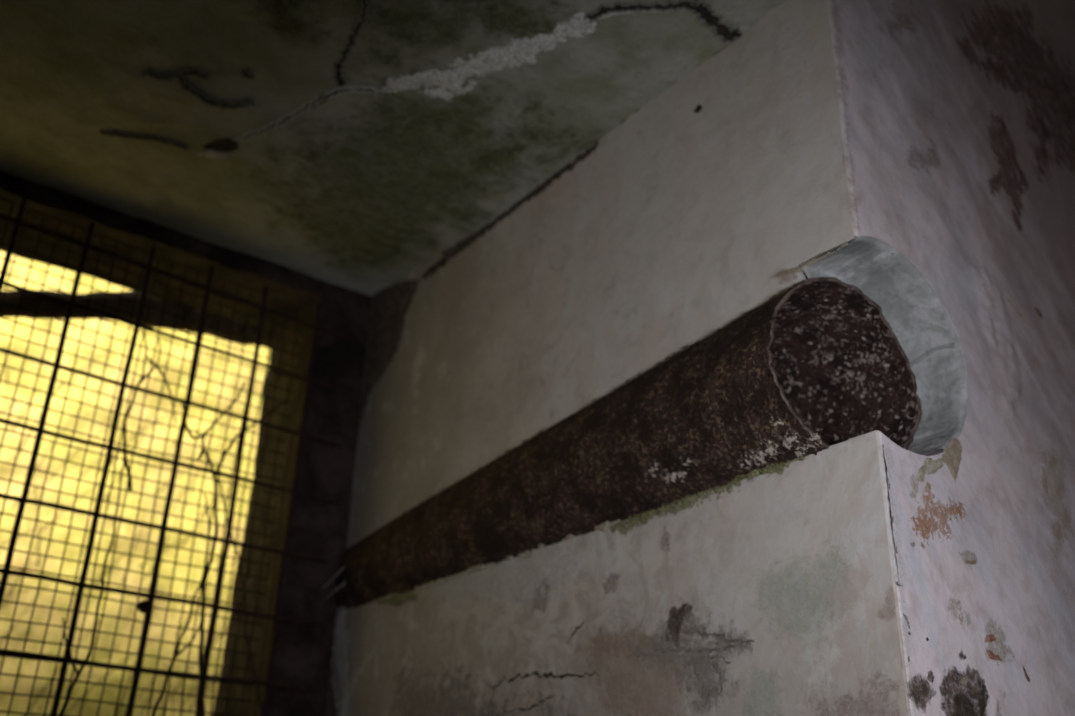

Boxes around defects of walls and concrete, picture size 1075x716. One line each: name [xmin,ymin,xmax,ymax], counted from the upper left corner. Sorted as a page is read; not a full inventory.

crack [142,0,742,142]
crack [422,140,598,280]
spalling [911,438,962,496]
damp [625,603,755,710]
damp [909,671,936,709]